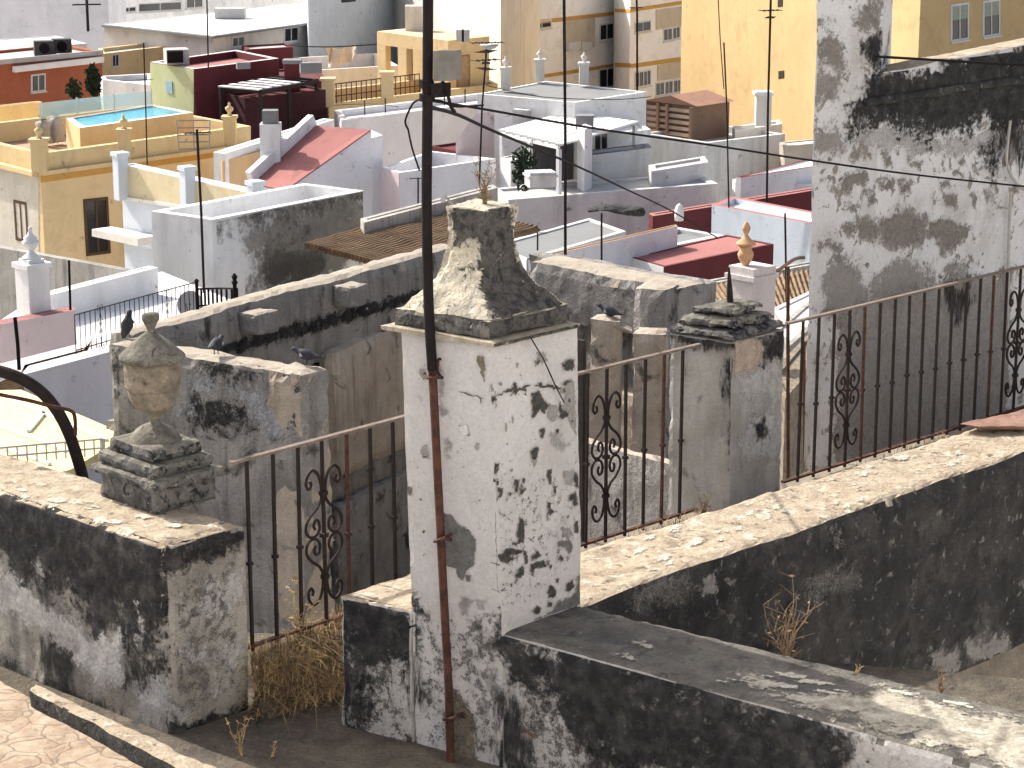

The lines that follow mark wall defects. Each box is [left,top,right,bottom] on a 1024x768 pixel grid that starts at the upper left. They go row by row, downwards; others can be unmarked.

damp [814,0,1024,211]
mould [112,349,124,402]
damp [169,288,423,446]
flaking render [489,363,521,406]
crack [461,384,561,404]
damp [0,490,248,734]
peeling [444,513,476,582]
flaking render [493,357,580,621]
damp [342,472,873,768]